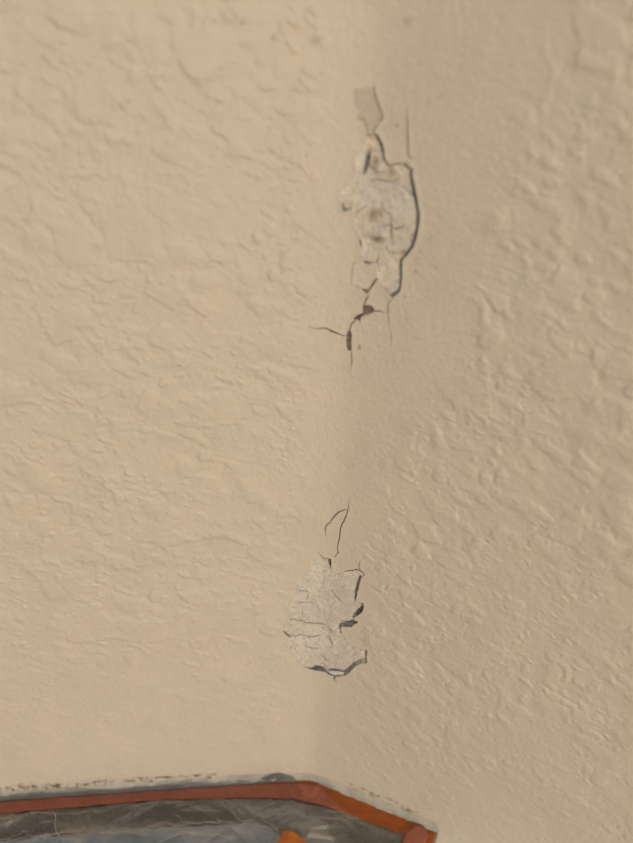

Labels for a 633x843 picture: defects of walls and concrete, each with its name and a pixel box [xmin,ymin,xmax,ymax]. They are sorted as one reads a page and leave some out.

spalling [341,89,420,298]
crack [310,266,391,364]
crack [322,509,348,566]
spalling [283,558,367,676]